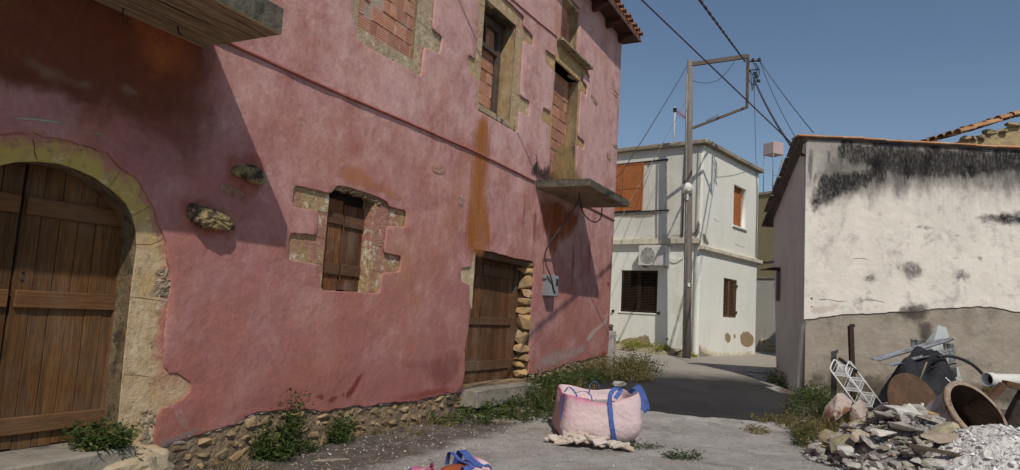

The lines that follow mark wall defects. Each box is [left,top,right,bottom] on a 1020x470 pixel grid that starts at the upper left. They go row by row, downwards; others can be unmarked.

corrosion [469,120,489,251]
water stain [809,140,1020,211]
corrosion [541,202,577,250]
water stain [984,213,1020,224]
flaking render [152,268,171,297]